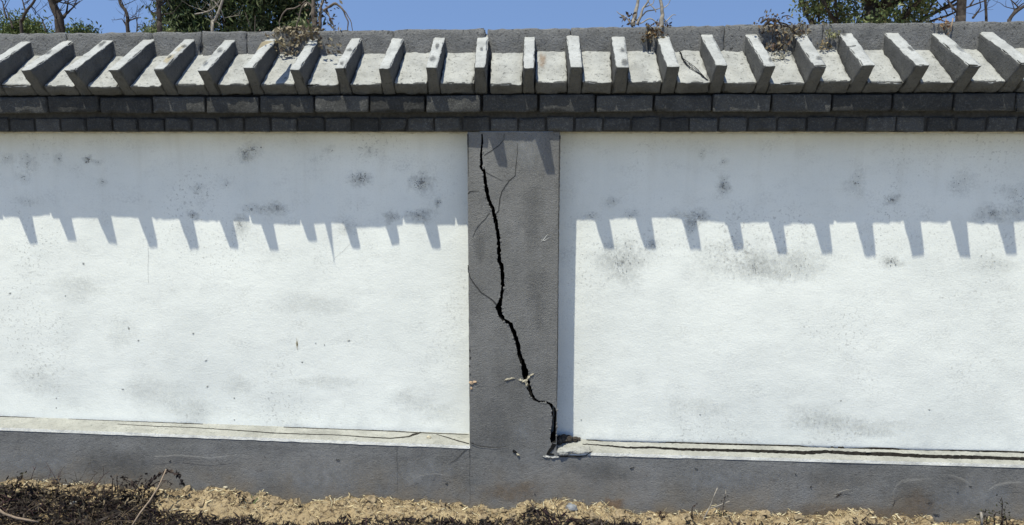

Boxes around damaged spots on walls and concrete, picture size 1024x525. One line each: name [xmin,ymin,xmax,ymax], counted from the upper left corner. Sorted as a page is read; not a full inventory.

crack [467,134,1024,461]